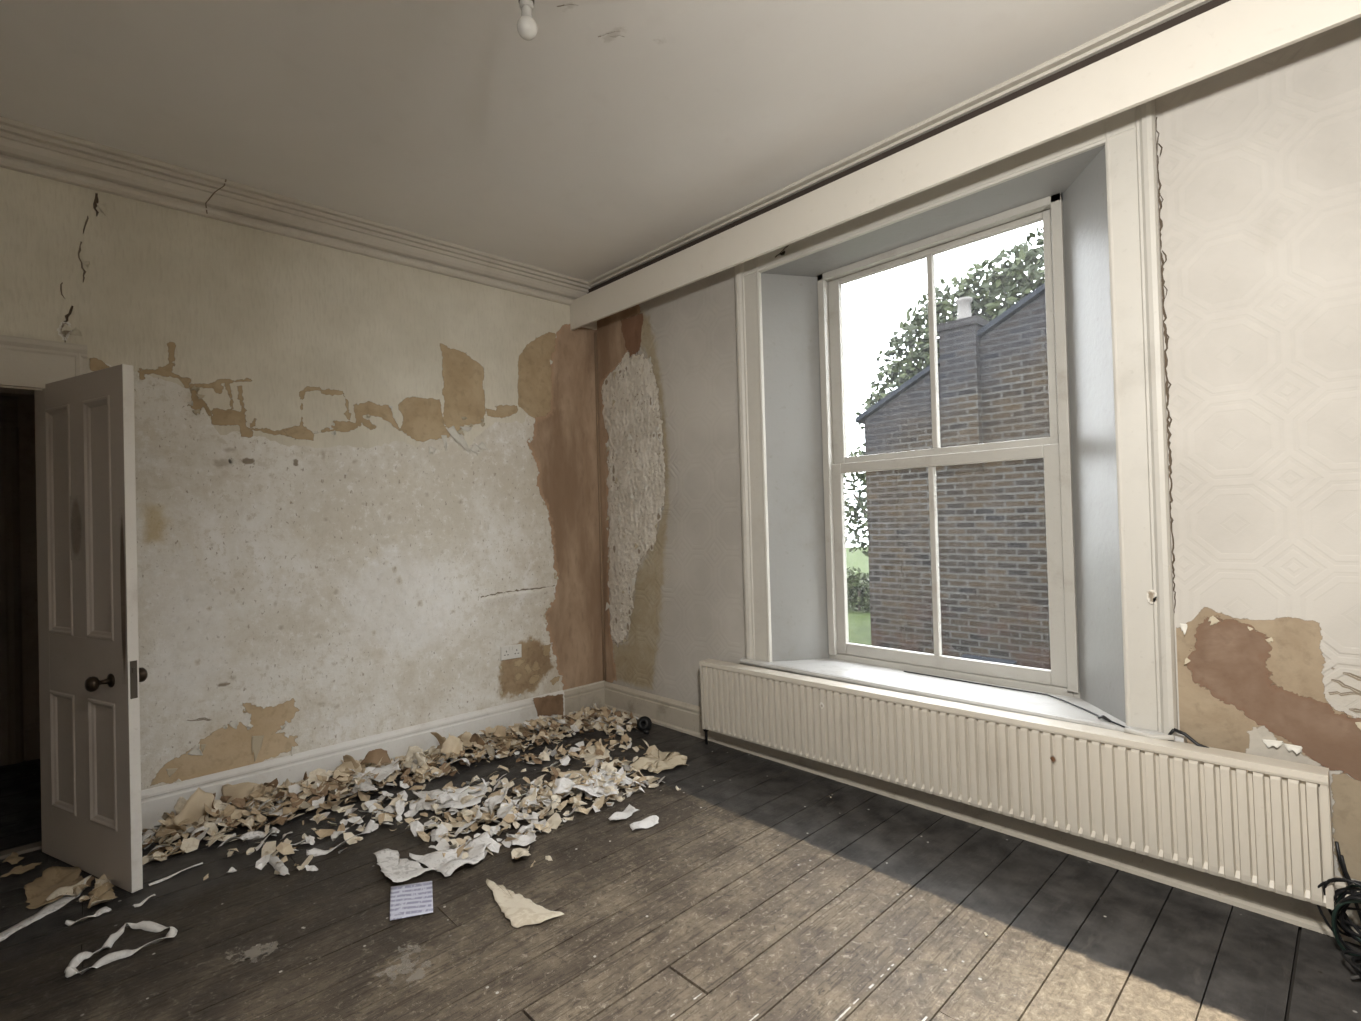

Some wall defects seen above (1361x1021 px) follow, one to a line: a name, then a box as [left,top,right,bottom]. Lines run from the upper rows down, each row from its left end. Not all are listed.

crack [57,193,107,342]
peeling [138,332,556,470]
crack [1156,117,1176,613]
peeling [601,351,666,647]
peeling [150,698,300,786]
peeling [1176,607,1352,760]
peeling [1330,773,1361,881]